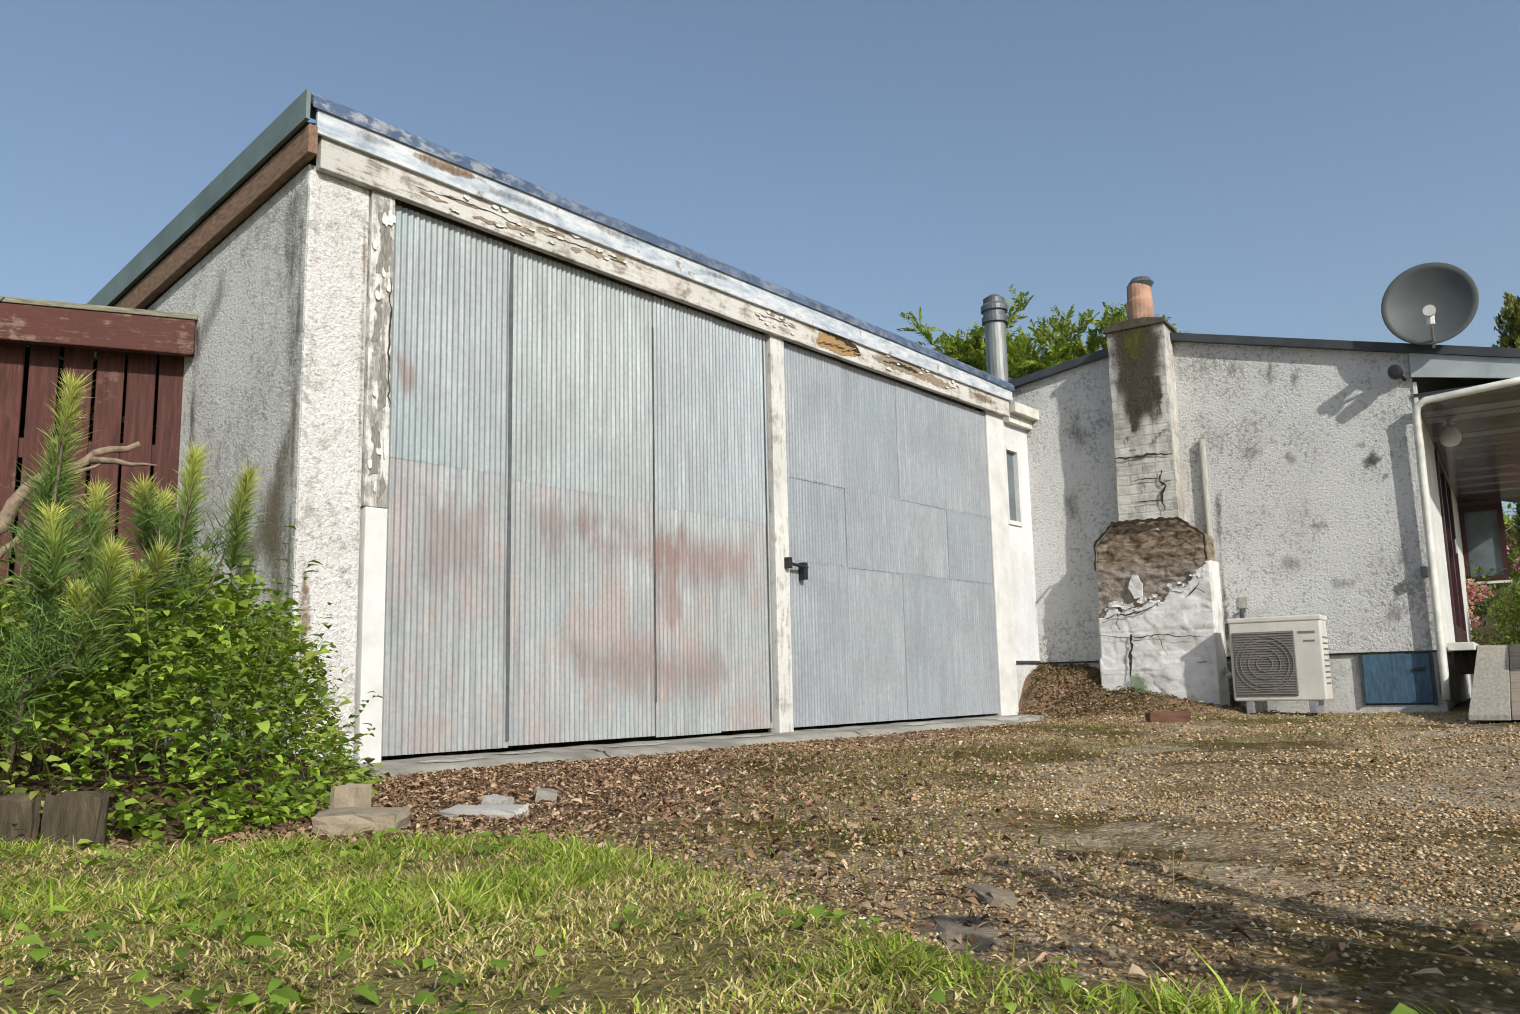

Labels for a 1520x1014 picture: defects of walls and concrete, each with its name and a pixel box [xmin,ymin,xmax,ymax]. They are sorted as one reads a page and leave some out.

peeling [416,186,627,266]
peeling [367,206,396,498]
peeling [756,311,796,335]
peeling [819,329,960,389]
leakage [1109,325,1162,431]
leakage [233,394,295,612]
crack [1115,453,1172,510]
flaking render [1093,517,1207,618]
crack [1099,582,1206,677]